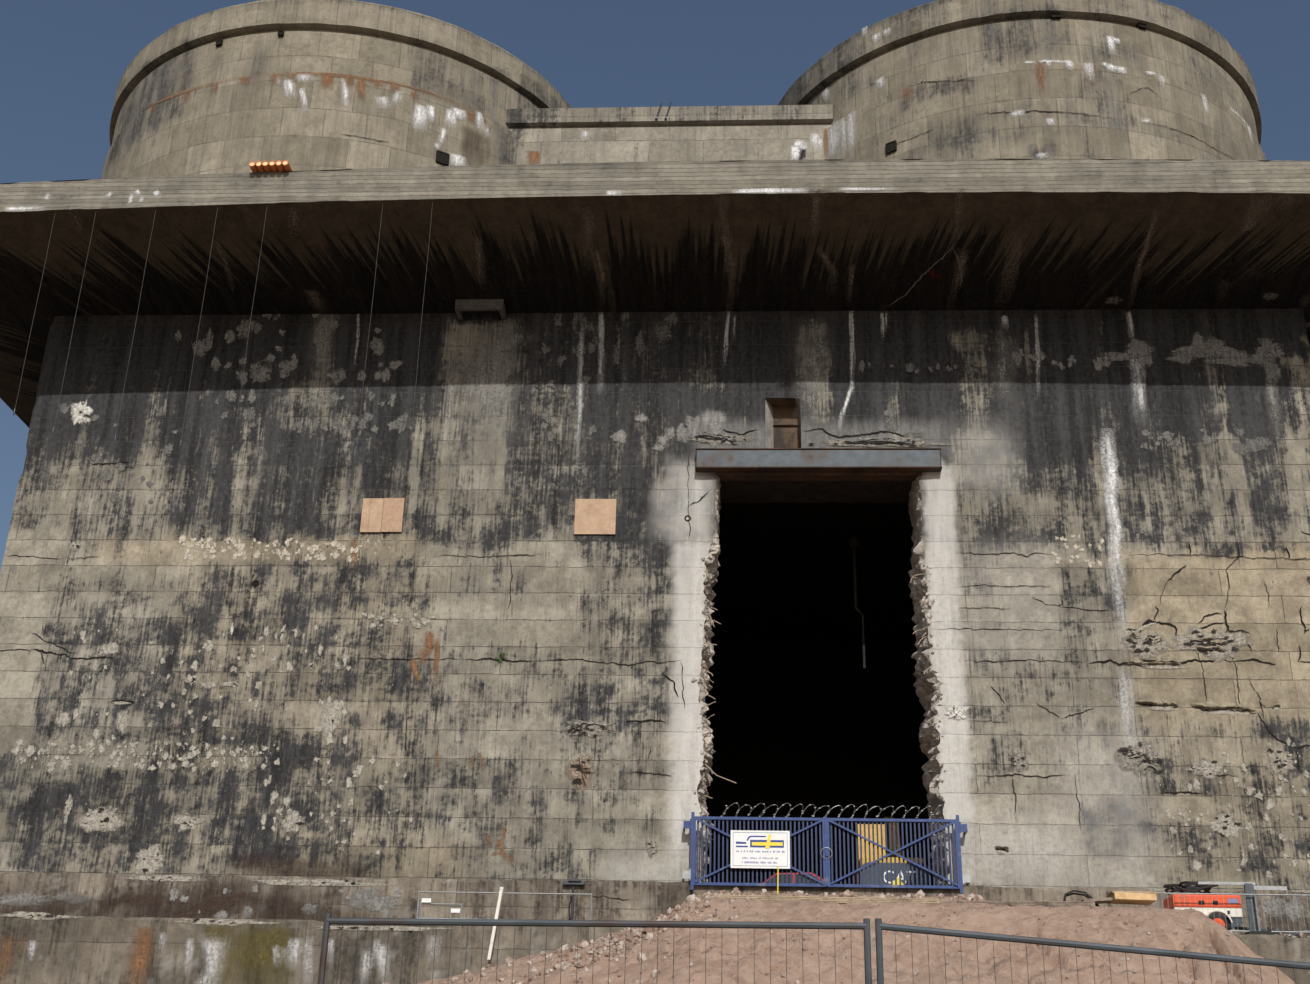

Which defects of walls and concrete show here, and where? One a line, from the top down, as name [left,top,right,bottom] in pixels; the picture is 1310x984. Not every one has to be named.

corrosion [273,72,439,97]
peeling [175,314,408,435]
leakage [448,325,523,429]
leakage [843,316,854,412]
leakage [1264,355,1276,413]
peeling [178,535,362,562]
leakage [1105,438,1121,600]
crack [0,633,117,664]
corrosion [411,633,440,679]
crack [947,531,1310,773]
peeling [11,623,375,850]
peeling [1165,738,1310,872]